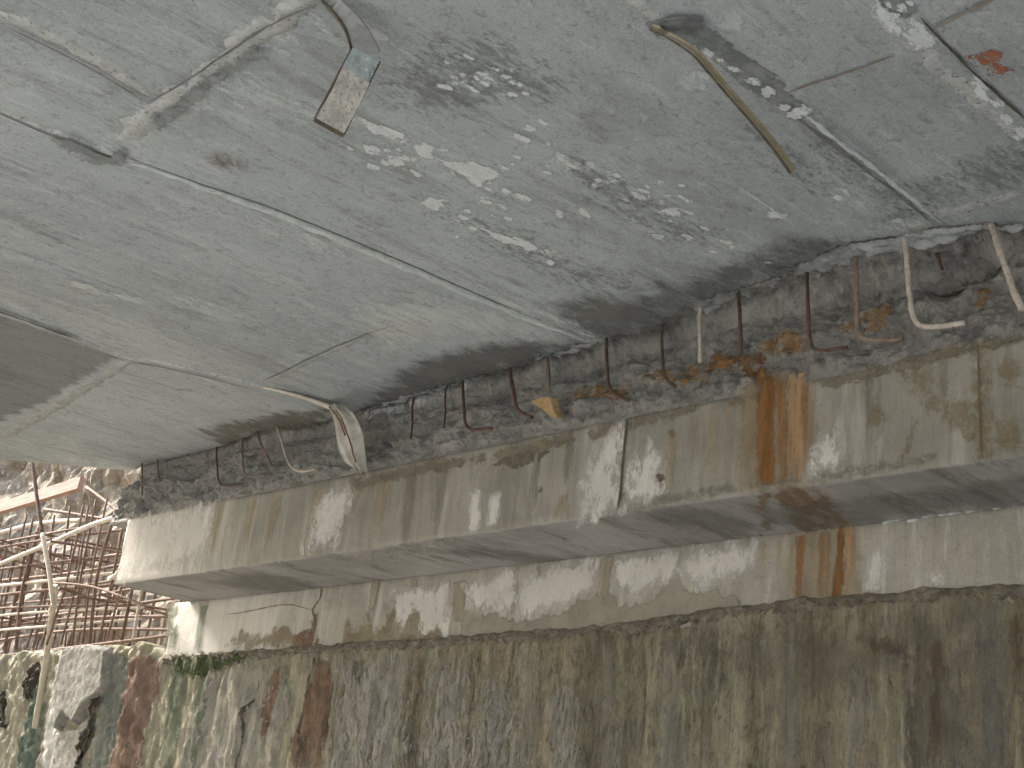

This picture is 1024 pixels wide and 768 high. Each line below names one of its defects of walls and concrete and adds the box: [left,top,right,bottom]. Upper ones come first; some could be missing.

peeling [436,43,530,97]
corrosion [966,50,1013,76]
peeling [347,117,557,266]
peeling [542,142,622,188]
spalling [110,172,1024,529]
water stain [346,239,841,411]
water stain [579,423,666,522]
corrosion [643,327,853,598]
water stain [17,664,60,768]
water stain [88,626,301,768]
crack [227,588,322,768]
water stain [326,539,760,768]